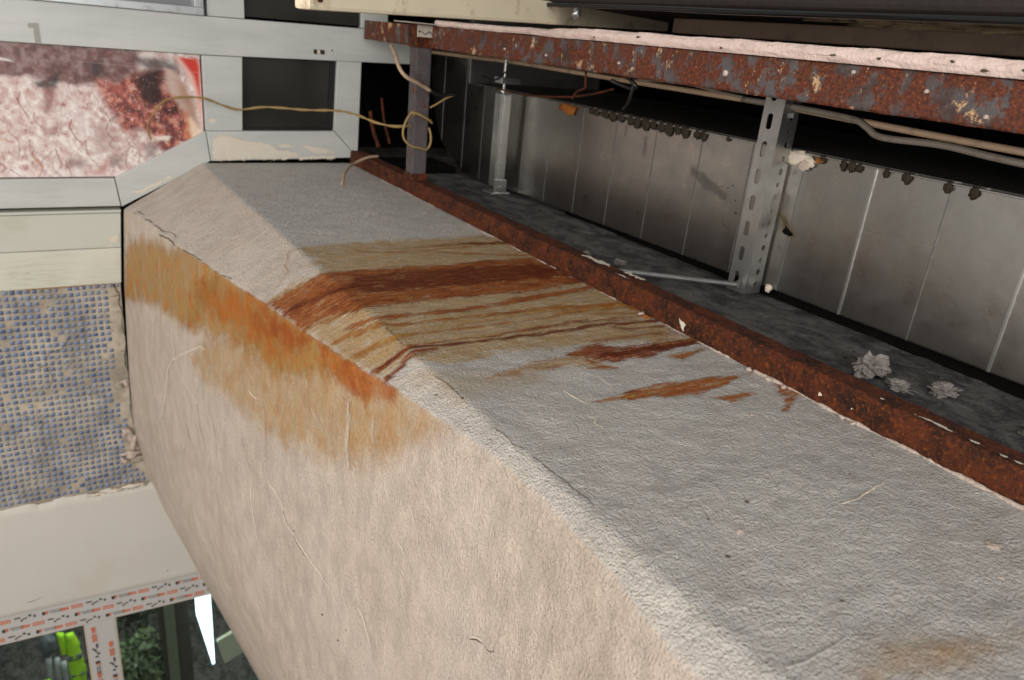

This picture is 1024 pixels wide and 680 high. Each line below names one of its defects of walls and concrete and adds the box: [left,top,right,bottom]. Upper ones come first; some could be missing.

peeling [211,134,336,161]
crack [133,211,202,261]
rust [267,237,702,382]
rust [596,375,753,403]
rust [774,384,800,411]